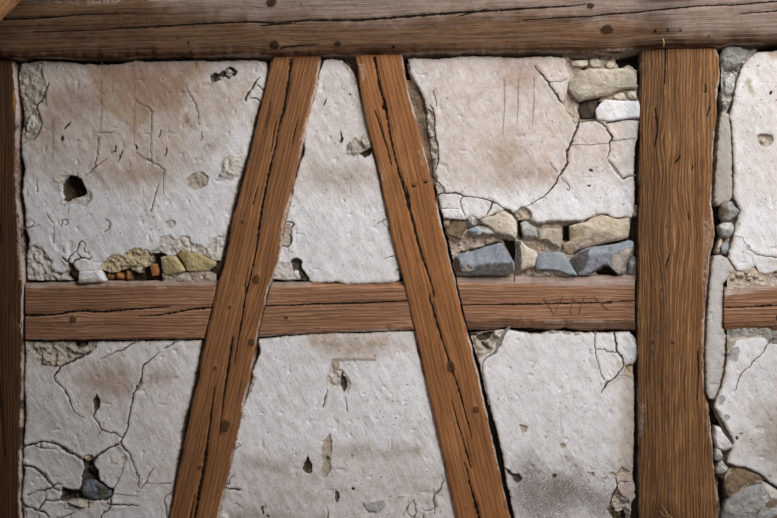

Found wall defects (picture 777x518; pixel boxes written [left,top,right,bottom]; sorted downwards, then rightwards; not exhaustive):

crack [136,102,165,212]
crack [23,131,113,275]
spalling [52,174,90,206]
spalling [515,207,630,224]
spalling [101,220,225,272]
crack [18,306,212,328]
crack [190,44,318,518]
crack [265,299,408,307]
crack [373,57,659,518]
crack [736,342,770,389]
crack [0,339,177,518]
spalling [607,491,630,518]